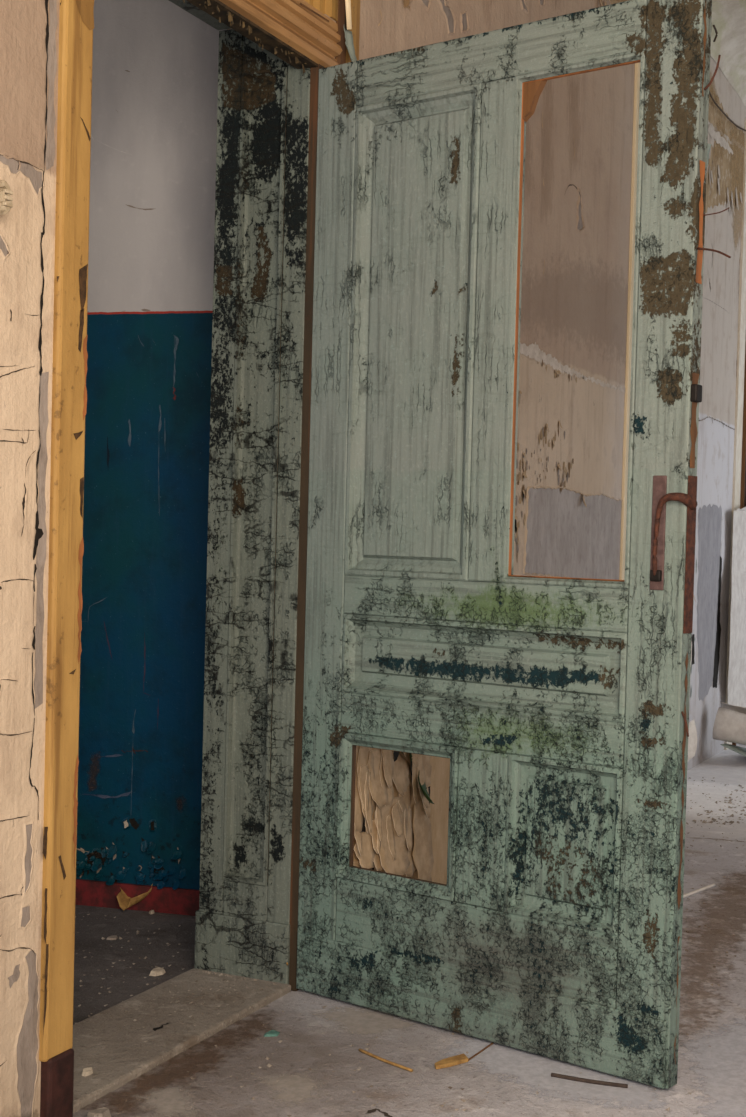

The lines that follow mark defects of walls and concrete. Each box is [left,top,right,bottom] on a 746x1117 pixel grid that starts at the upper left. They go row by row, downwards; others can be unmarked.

flaking render [705,84,745,216]
crack [0,0,49,826]
crack [0,883,23,899]
crack [0,934,36,956]
flaking render [8,755,187,1117]